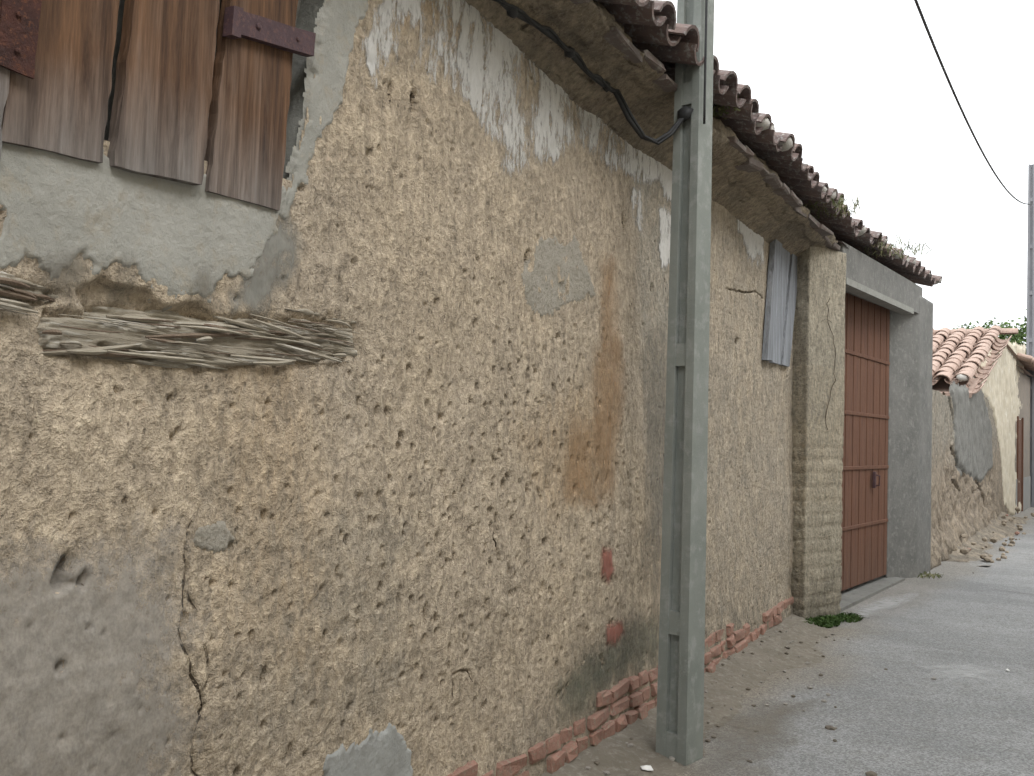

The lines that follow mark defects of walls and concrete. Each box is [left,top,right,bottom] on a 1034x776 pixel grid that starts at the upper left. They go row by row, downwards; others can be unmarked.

peeling [362,0,672,268]
crack [821,298,836,430]
crack [177,554,209,776]